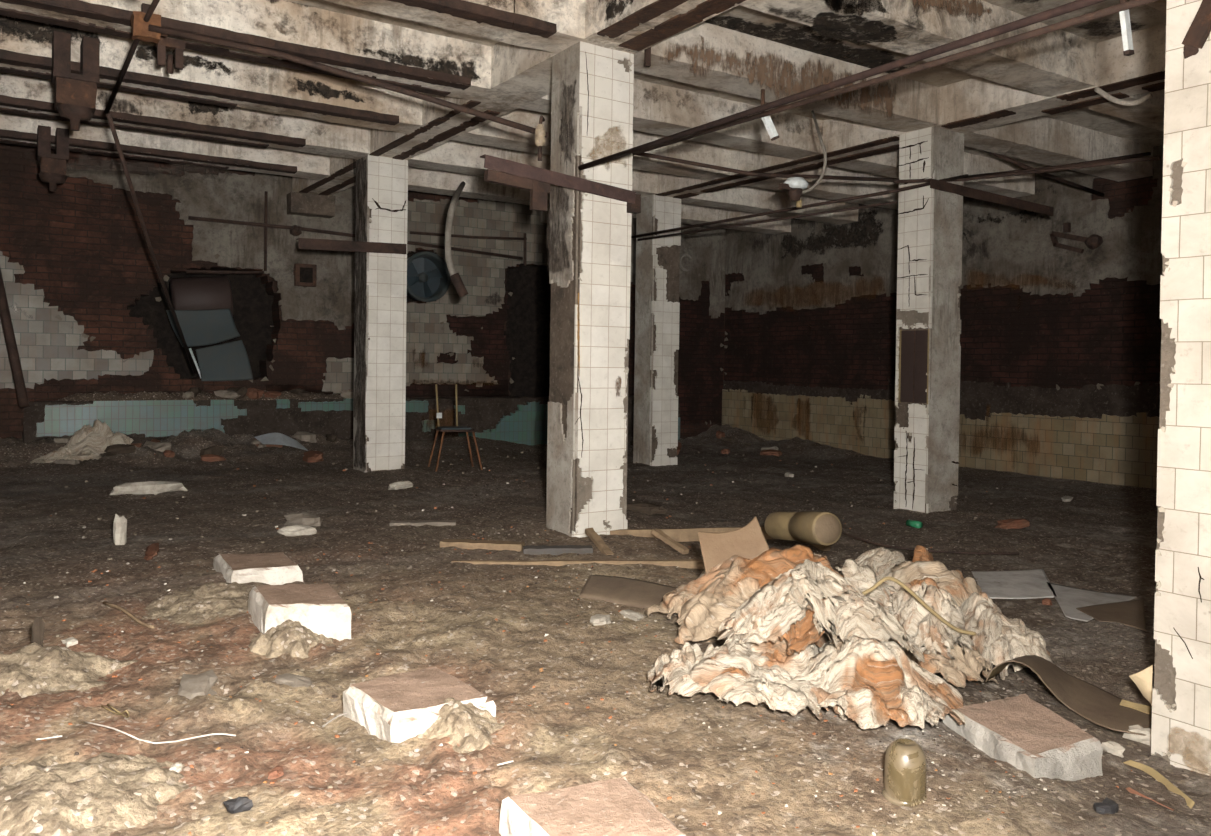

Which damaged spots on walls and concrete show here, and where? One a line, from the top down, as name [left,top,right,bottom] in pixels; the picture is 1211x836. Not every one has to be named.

leakage [0,15,101,44]
leakage [135,45,231,75]
leakage [666,0,897,118]
spalling [1092,160,1187,220]
spalling [0,172,370,407]
spalling [549,145,588,444]
spalling [650,215,932,450]
spalling [957,254,1176,432]
spalling [650,425,677,466]
spalling [568,457,593,534]
spalling [1154,639,1177,713]